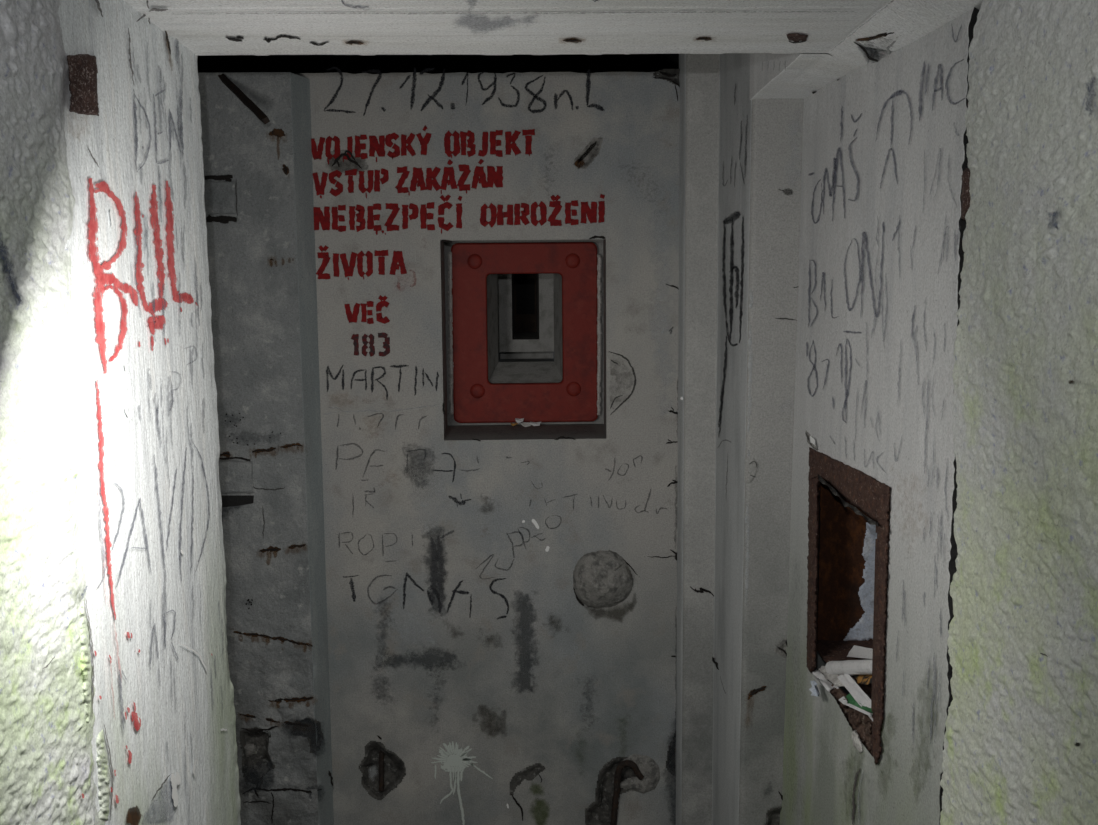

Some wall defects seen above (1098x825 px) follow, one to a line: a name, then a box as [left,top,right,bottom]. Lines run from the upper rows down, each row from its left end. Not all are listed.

spalling [854,32,896,62]
corrosion [252,443,302,458]
corrosion [260,544,306,565]
corrosion [233,631,313,652]
spalling [286,718,324,755]
spalling [240,727,275,792]